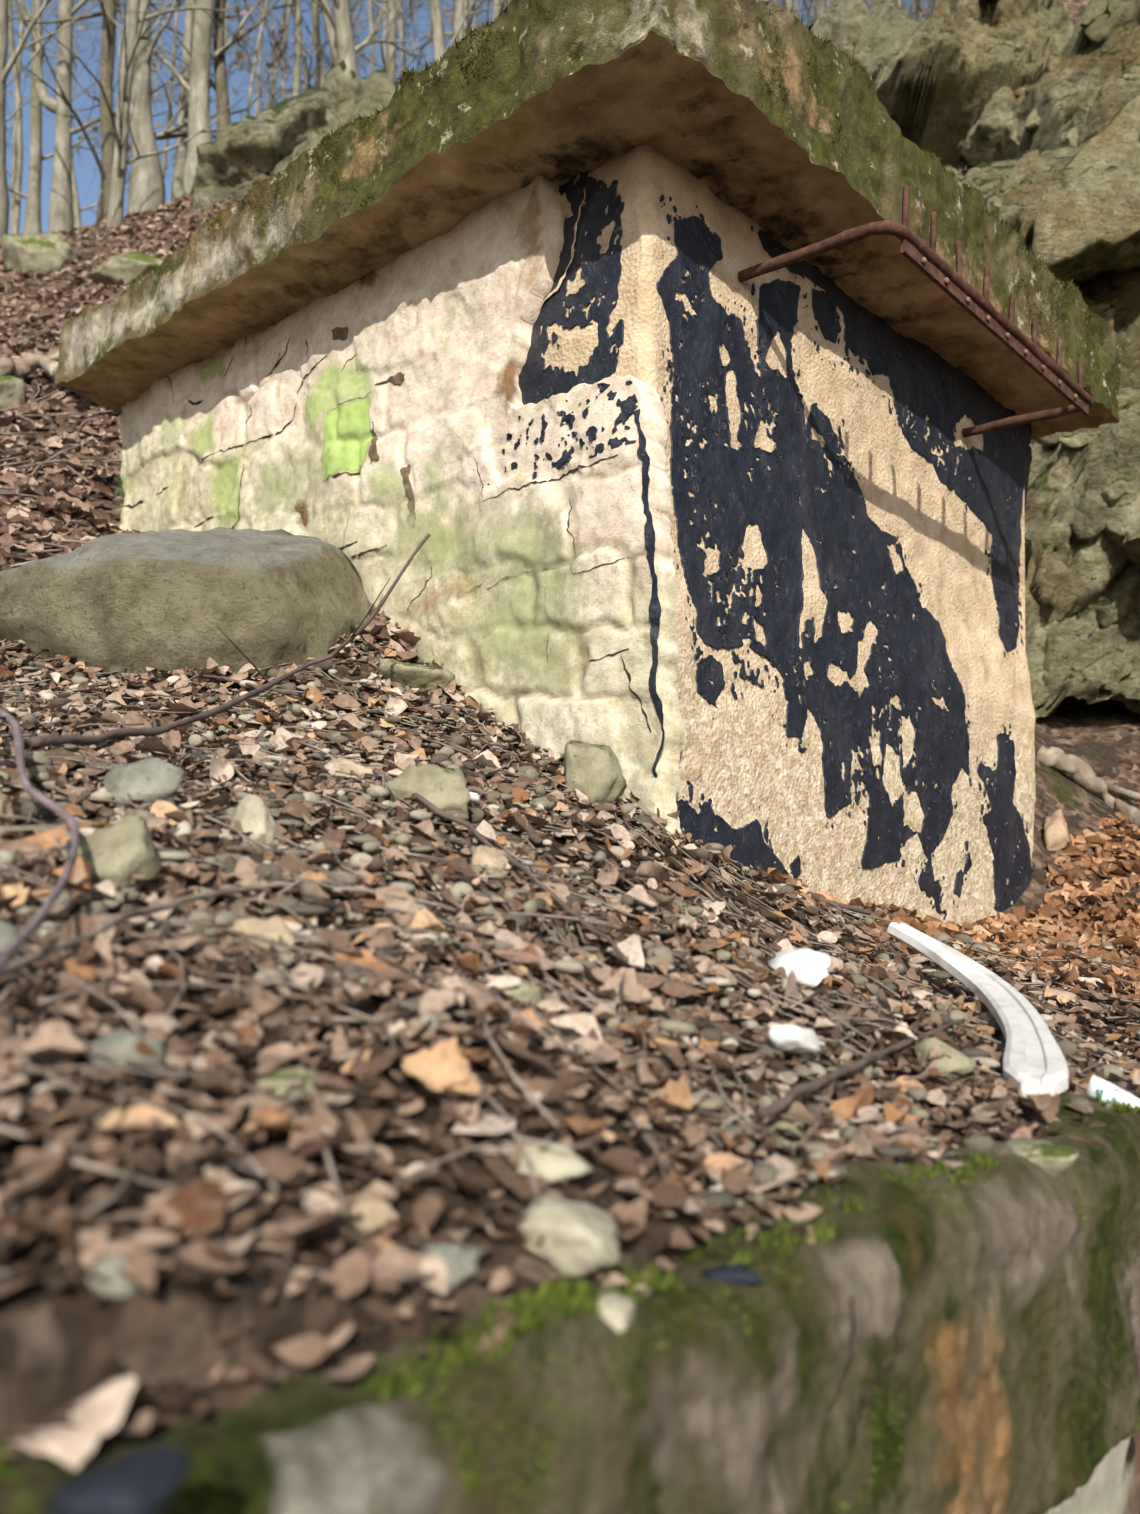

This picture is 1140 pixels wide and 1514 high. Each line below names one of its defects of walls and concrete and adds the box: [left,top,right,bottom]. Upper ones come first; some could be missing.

peeling [502,172,640,479]
crack [120,486,169,533]
crack [166,336,404,529]
leakage [260,366,373,513]
crack [339,541,387,558]
crack [407,555,432,610]
crack [465,409,665,777]
peeling [656,194,1035,921]